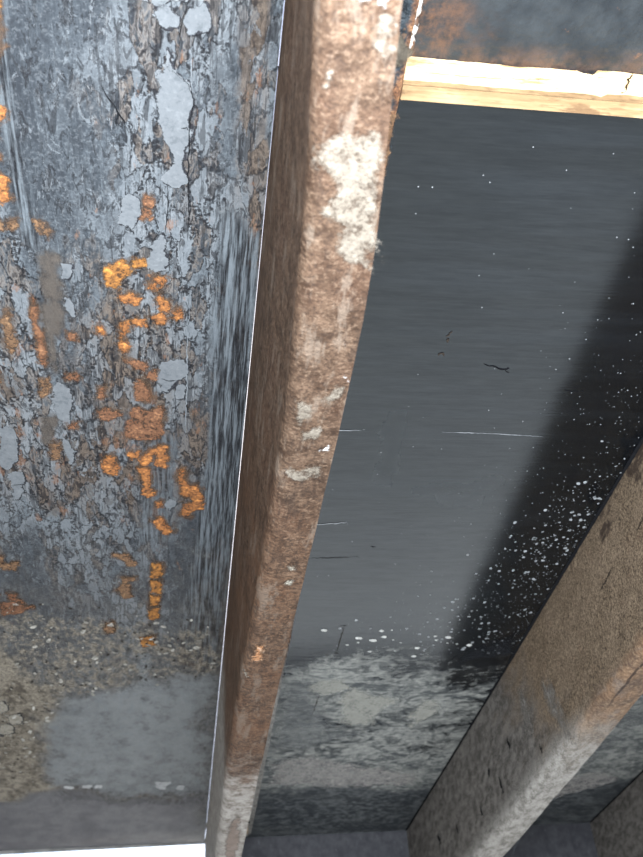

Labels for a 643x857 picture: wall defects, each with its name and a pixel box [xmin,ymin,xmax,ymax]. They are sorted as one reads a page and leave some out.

peeling [142,0,213,37]
peeling [154,47,195,189]
rust [0,172,12,207]
rust [31,219,51,236]
peeling [146,234,170,272]
rust [97,257,206,535]
peeling [157,359,190,400]
rust [147,562,166,620]
damp [307,680,395,725]
damp [155,782,185,790]
damp [272,758,418,787]
damp [554,772,618,798]